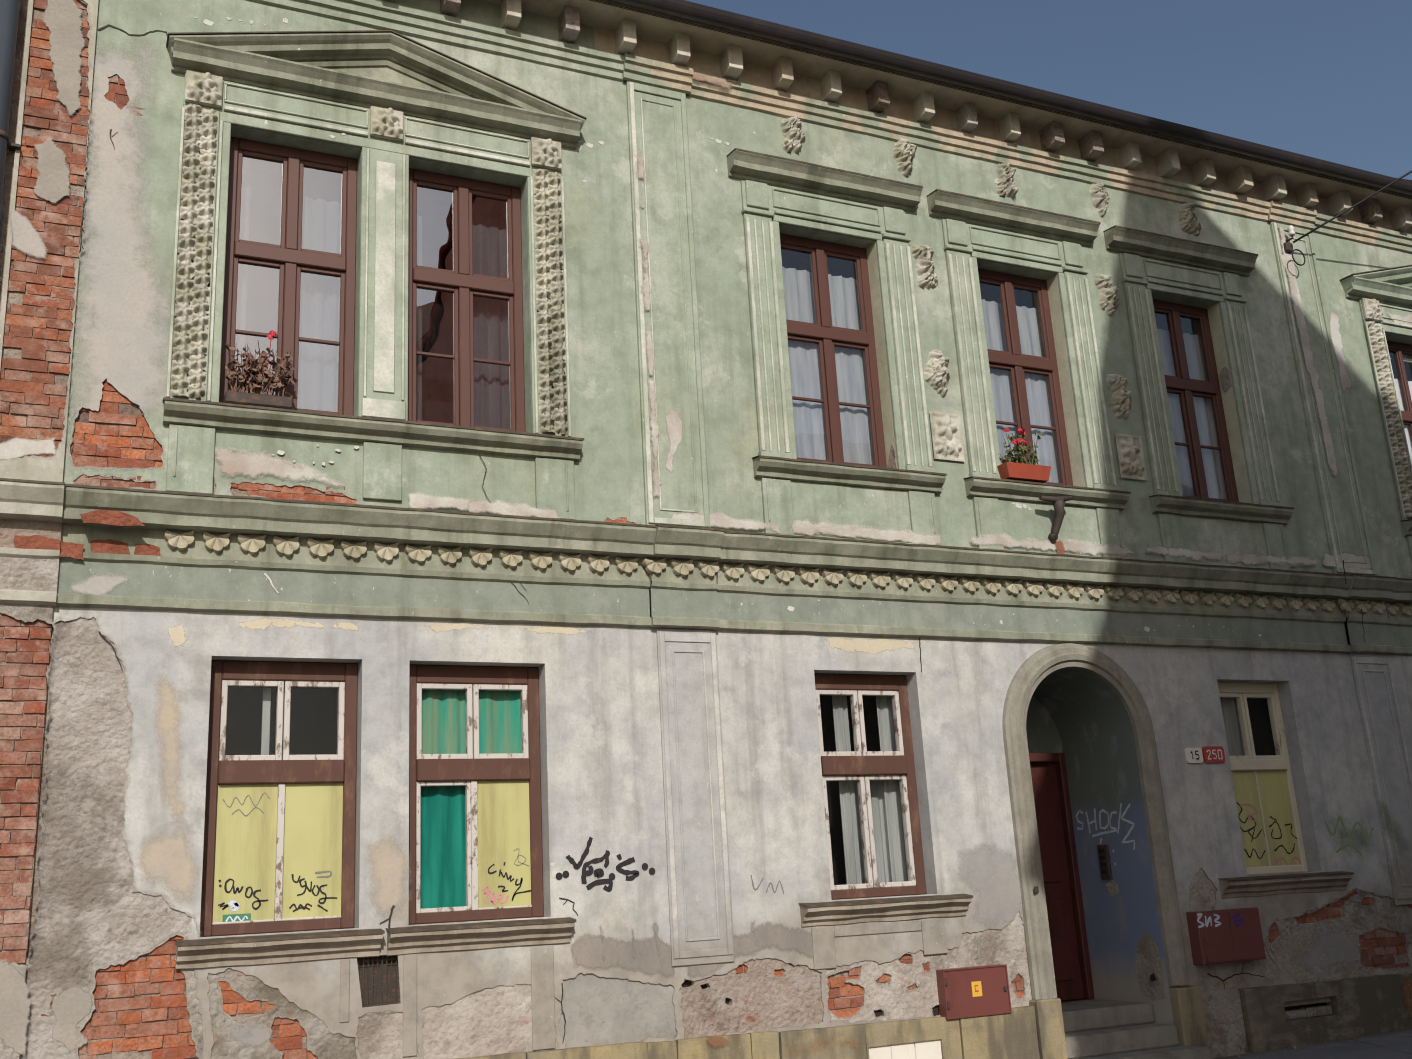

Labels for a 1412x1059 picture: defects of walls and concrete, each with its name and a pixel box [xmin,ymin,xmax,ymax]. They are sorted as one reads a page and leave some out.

flaking render [0,0,170,490]
peeling [213,445,359,504]
flaking render [13,510,160,560]
peeling [71,575,128,595]
flaking render [0,612,1032,1059]
flaking render [1294,890,1375,924]
flaking render [1196,922,1281,992]
flaking render [1359,928,1410,969]